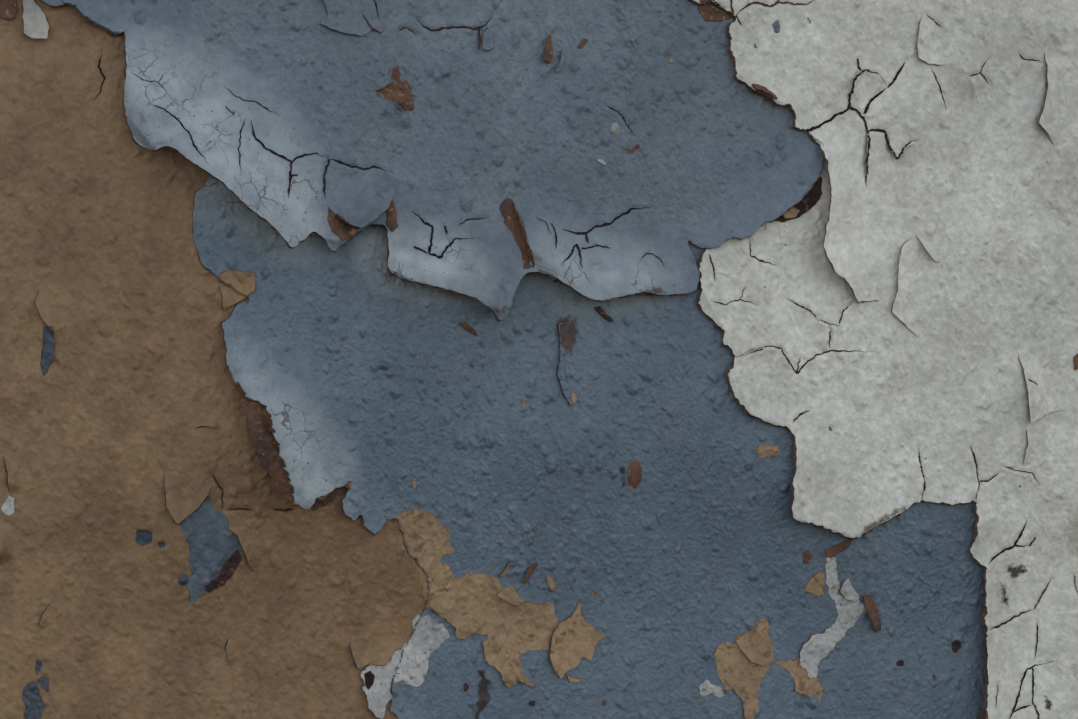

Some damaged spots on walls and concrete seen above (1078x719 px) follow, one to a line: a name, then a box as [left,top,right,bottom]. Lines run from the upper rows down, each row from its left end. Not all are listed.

crack [224,86,390,199]
crack [793,59,946,189]
crack [414,213,486,259]
peeling [0,0,979,540]
crack [538,207,651,266]
crack [737,299,876,374]
peeling [1017,334,1078,423]
peeling [164,467,259,606]
peeling [212,269,605,719]
peeling [699,557,881,719]
peeling [971,550,1035,719]
crack [992,575,1078,719]